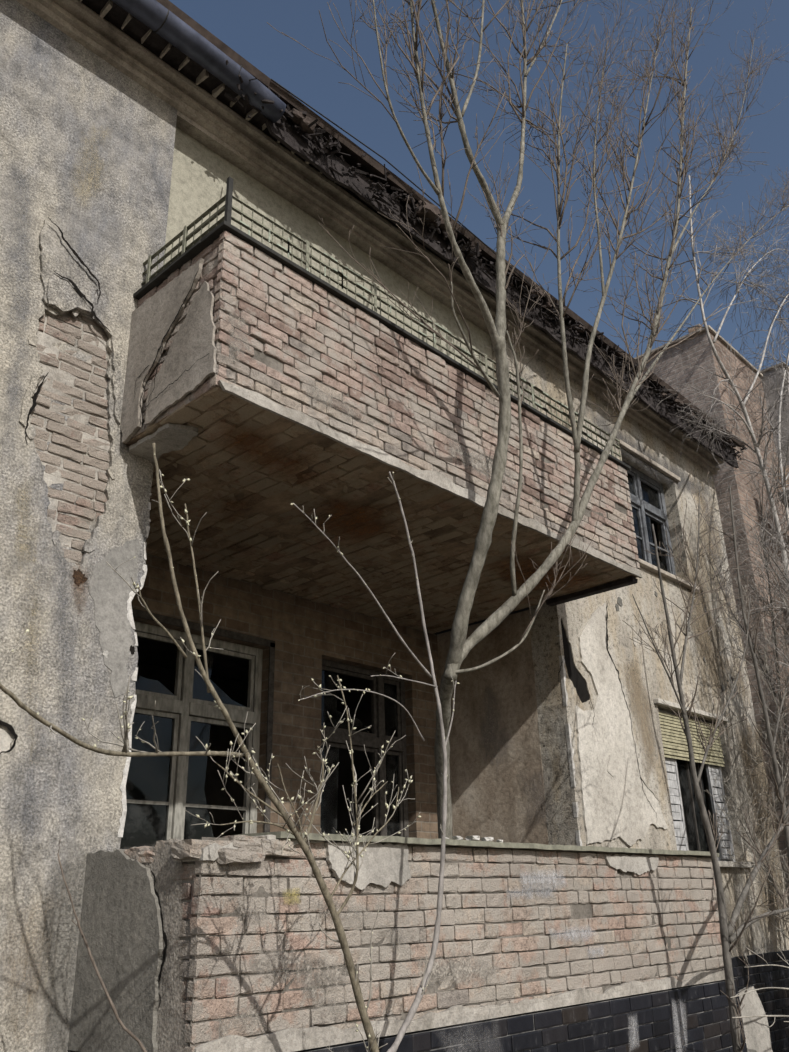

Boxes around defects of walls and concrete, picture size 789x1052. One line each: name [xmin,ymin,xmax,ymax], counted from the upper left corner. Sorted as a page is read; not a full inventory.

spalling [26,309,117,586]
crack [121,258,217,444]
spalling [0,720,18,754]
peeling [559,597,668,875]
crack [606,604,659,827]